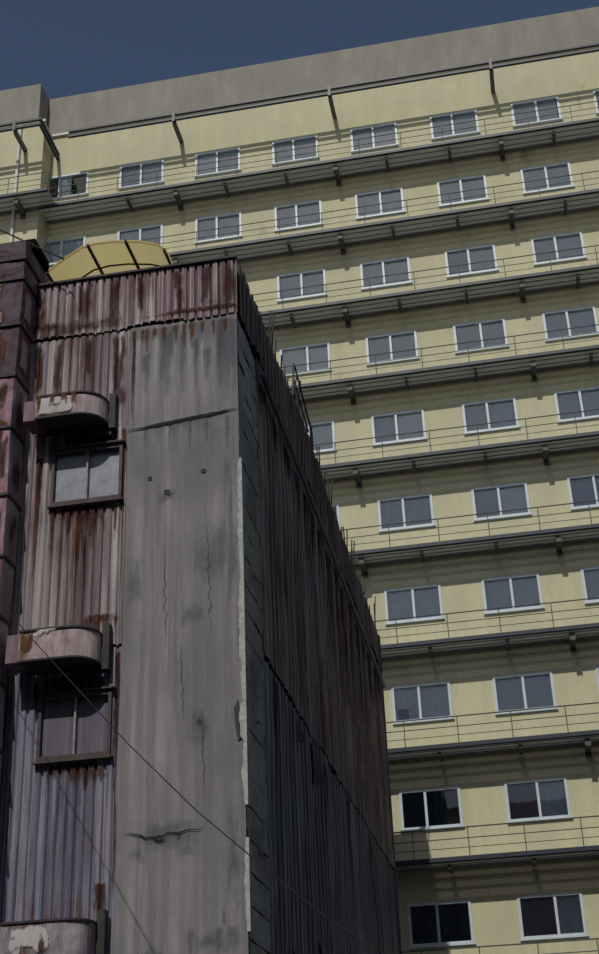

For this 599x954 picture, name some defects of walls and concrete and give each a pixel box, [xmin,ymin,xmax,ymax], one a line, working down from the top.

corrosion [33,279,120,411]
corrosion [113,263,236,402]
corrosion [0,394,23,491]
corrosion [32,428,126,566]
spalling [234,457,250,806]
peeling [9,925,49,954]
crack [126,828,200,842]
spalling [244,837,252,932]